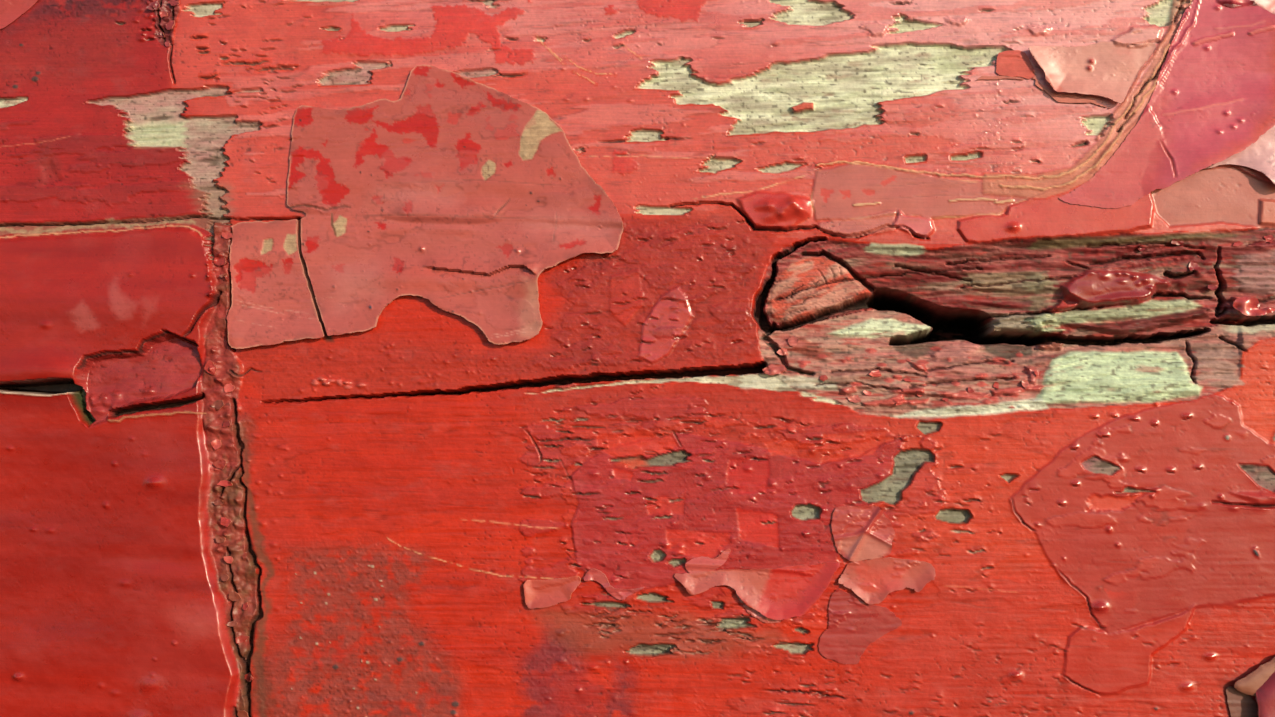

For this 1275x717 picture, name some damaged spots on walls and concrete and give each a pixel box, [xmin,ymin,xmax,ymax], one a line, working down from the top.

peeling [633,0,1275,243]
crack [0,214,301,236]
peeling [83,65,695,349]
peeling [67,329,235,428]
peeling [826,317,932,342]
peeling [989,313,1055,339]
crack [261,361,765,547]
crack [749,422,825,462]
peeling [523,568,675,610]
crack [761,517,777,526]
peeling [648,422,944,664]
peeling [999,350,1275,697]